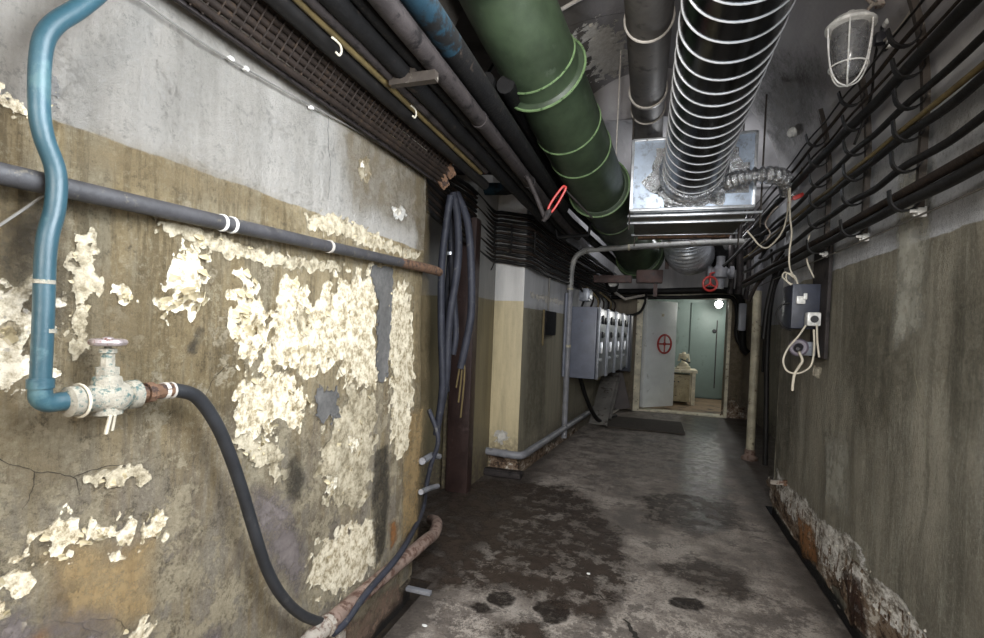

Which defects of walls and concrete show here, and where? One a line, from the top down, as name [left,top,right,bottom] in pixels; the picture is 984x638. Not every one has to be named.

peeling [0,82,28,119]
spalling [391,205,407,221]
peeling [55,227,139,361]
peeling [0,274,33,394]
peeling [152,210,420,608]
water stain [348,124,627,638]
crack [0,459,132,510]
peeling [83,463,152,489]
peeling [0,503,170,620]
peeling [122,614,158,638]
crack [594,594,639,638]
corrosion [843,570,868,636]